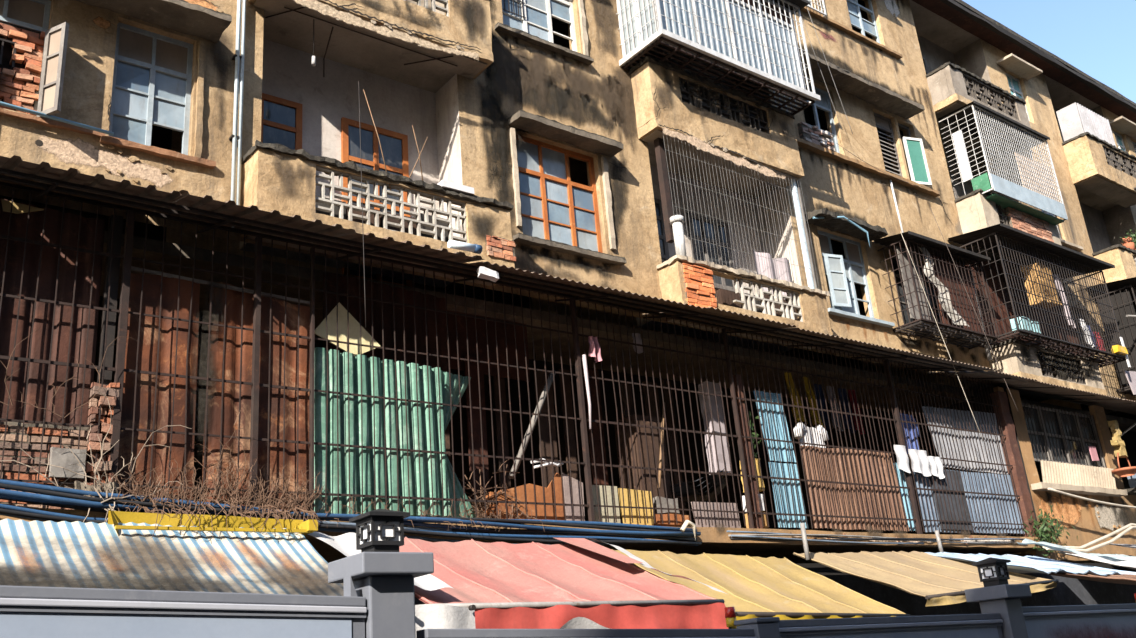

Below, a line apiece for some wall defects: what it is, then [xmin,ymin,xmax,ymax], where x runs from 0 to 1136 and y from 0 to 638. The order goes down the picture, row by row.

peeling [185,0,223,13]
peeling [295,0,479,59]
leakage [453,0,637,241]
peeling [38,135,173,187]
leakage [514,246,614,288]
rust [0,198,105,427]
rust [117,272,449,511]